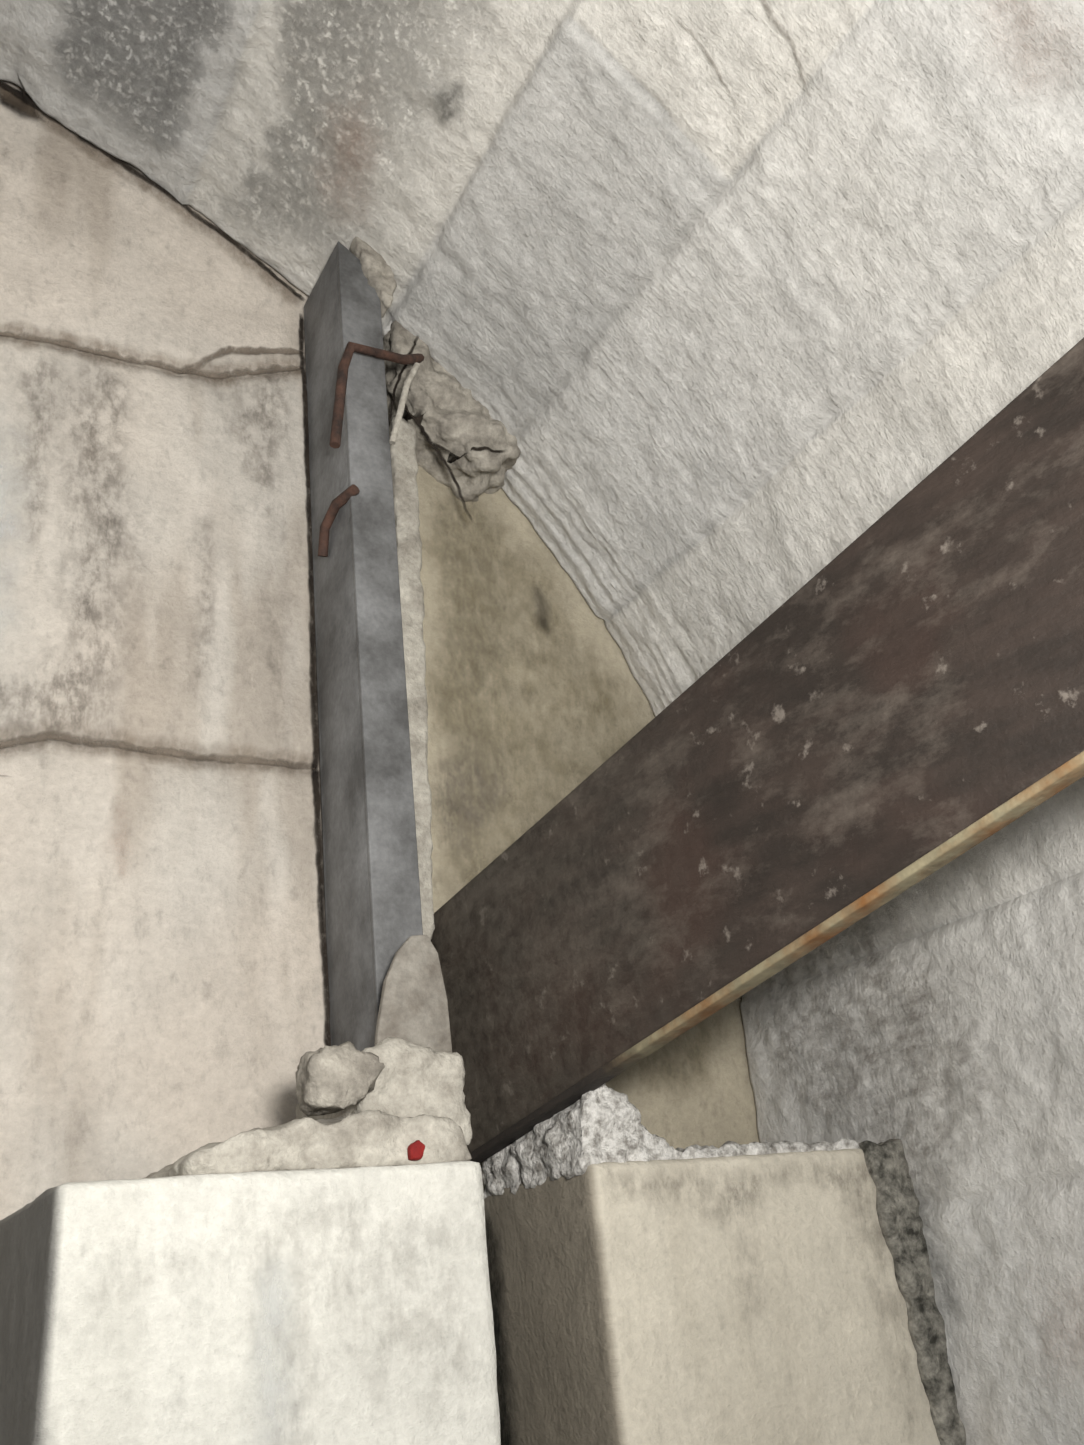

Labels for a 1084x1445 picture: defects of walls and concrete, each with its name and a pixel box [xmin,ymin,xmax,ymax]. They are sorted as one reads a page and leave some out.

crack [0,77,331,1046]